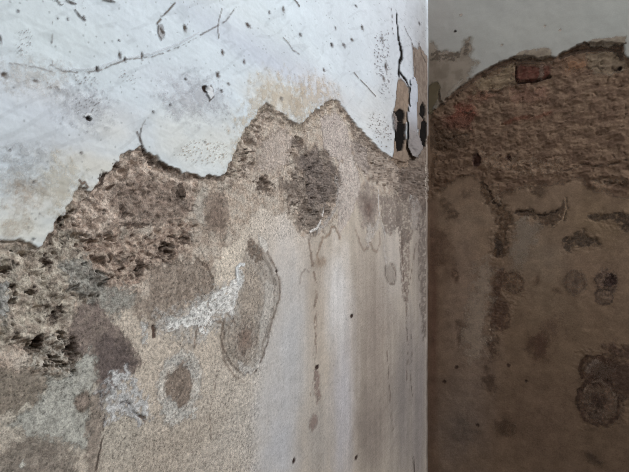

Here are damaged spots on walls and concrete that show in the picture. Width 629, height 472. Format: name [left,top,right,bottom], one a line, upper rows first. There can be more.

crack [391,9,410,102]
spalling [429,36,629,258]
damp [65,301,151,472]
damp [134,233,280,427]
spalling [0,47,428,449]
damp [457,258,525,358]
damp [563,269,618,305]
damp [575,344,629,426]